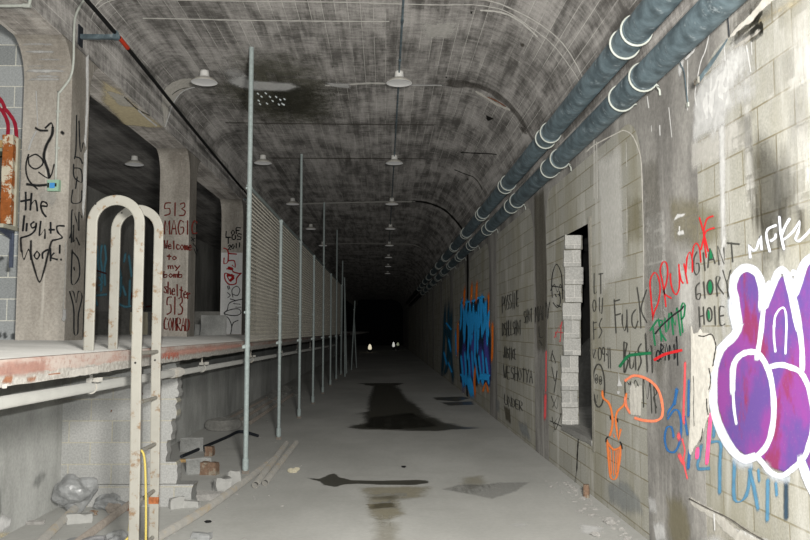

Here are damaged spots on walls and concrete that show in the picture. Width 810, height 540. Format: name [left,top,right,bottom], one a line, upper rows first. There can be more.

damp [751,142,802,241]
damp [351,383,473,431]
damp [310,474,428,520]
spalling [689,498,764,540]